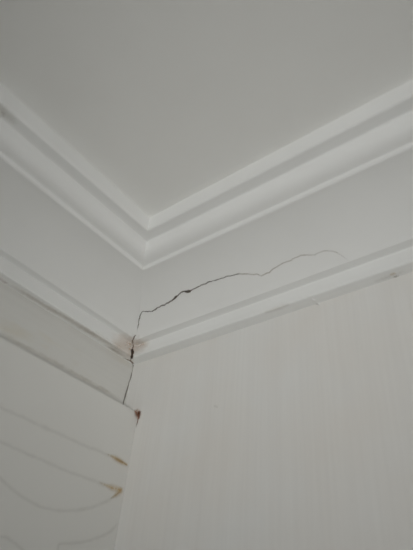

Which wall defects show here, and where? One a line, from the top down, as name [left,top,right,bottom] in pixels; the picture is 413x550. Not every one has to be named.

crack [137,255,302,329]